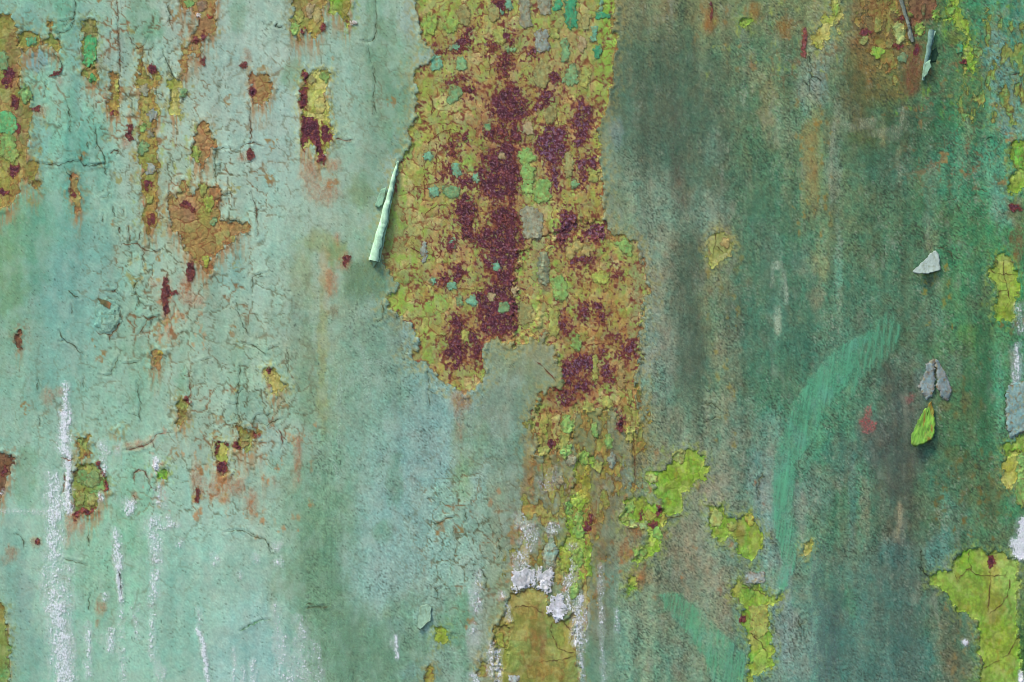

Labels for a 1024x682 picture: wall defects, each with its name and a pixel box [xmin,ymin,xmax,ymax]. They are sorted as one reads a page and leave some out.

peeling [0,13,62,210]
crack [44,92,157,388]
crack [116,3,173,96]
peeling [134,0,251,274]
crack [214,107,261,230]
peeling [298,69,335,165]
crack [232,273,289,444]
peeling [381,0,709,682]
water stain [17,380,91,682]
peeling [70,434,109,521]
peeling [708,505,783,682]
peeling [929,548,1023,682]